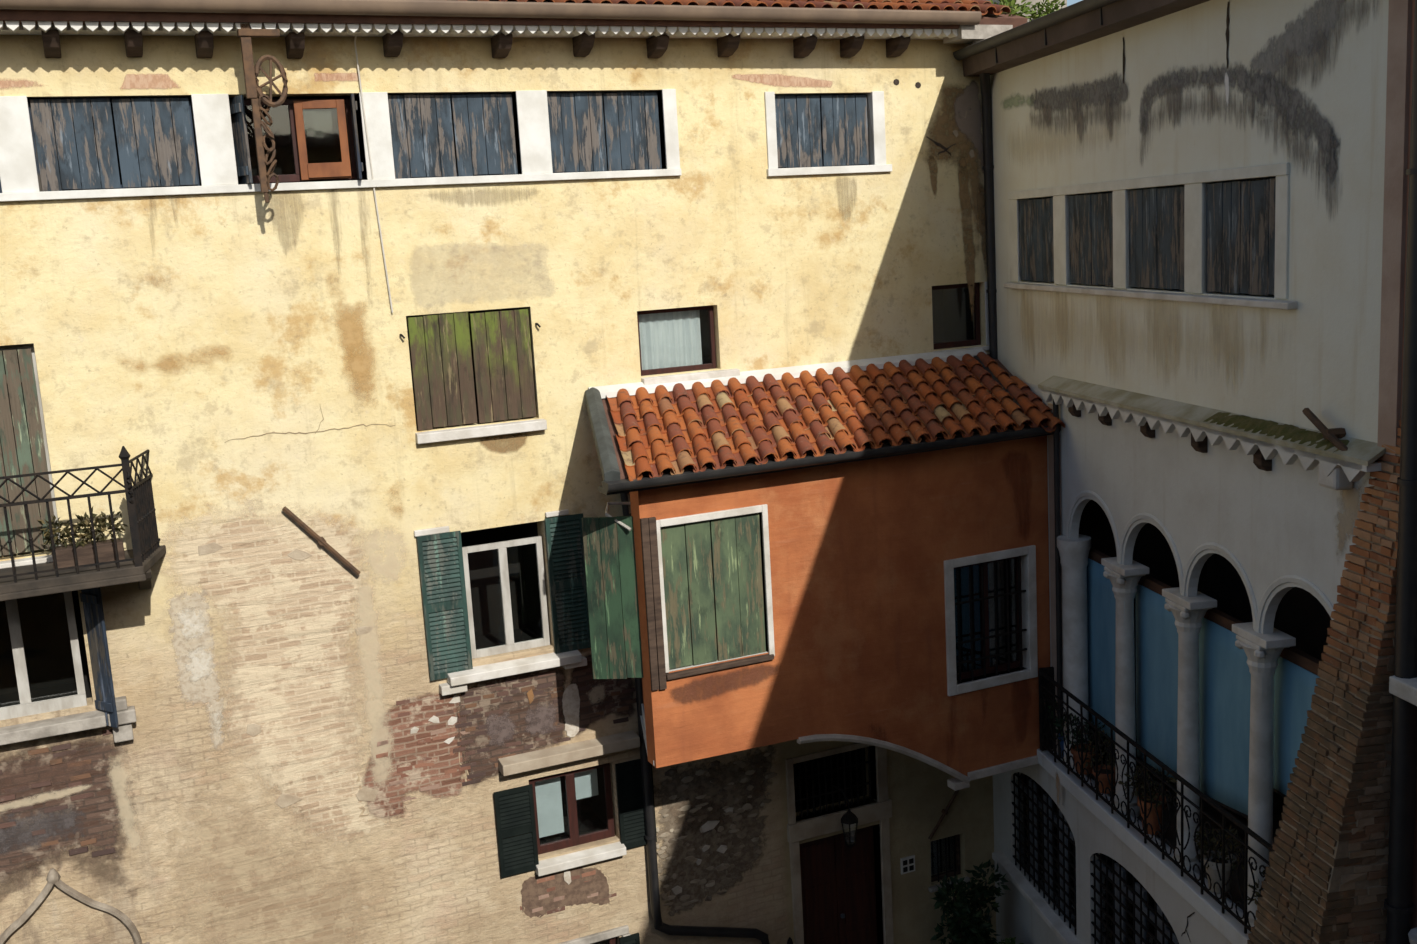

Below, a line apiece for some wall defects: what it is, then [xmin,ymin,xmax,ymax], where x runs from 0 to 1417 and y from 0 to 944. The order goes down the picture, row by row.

damp [929,86,987,314]
damp [1004,0,1367,208]
peeling [163,507,636,839]
spalling [0,729,135,886]
spalling [510,861,619,927]